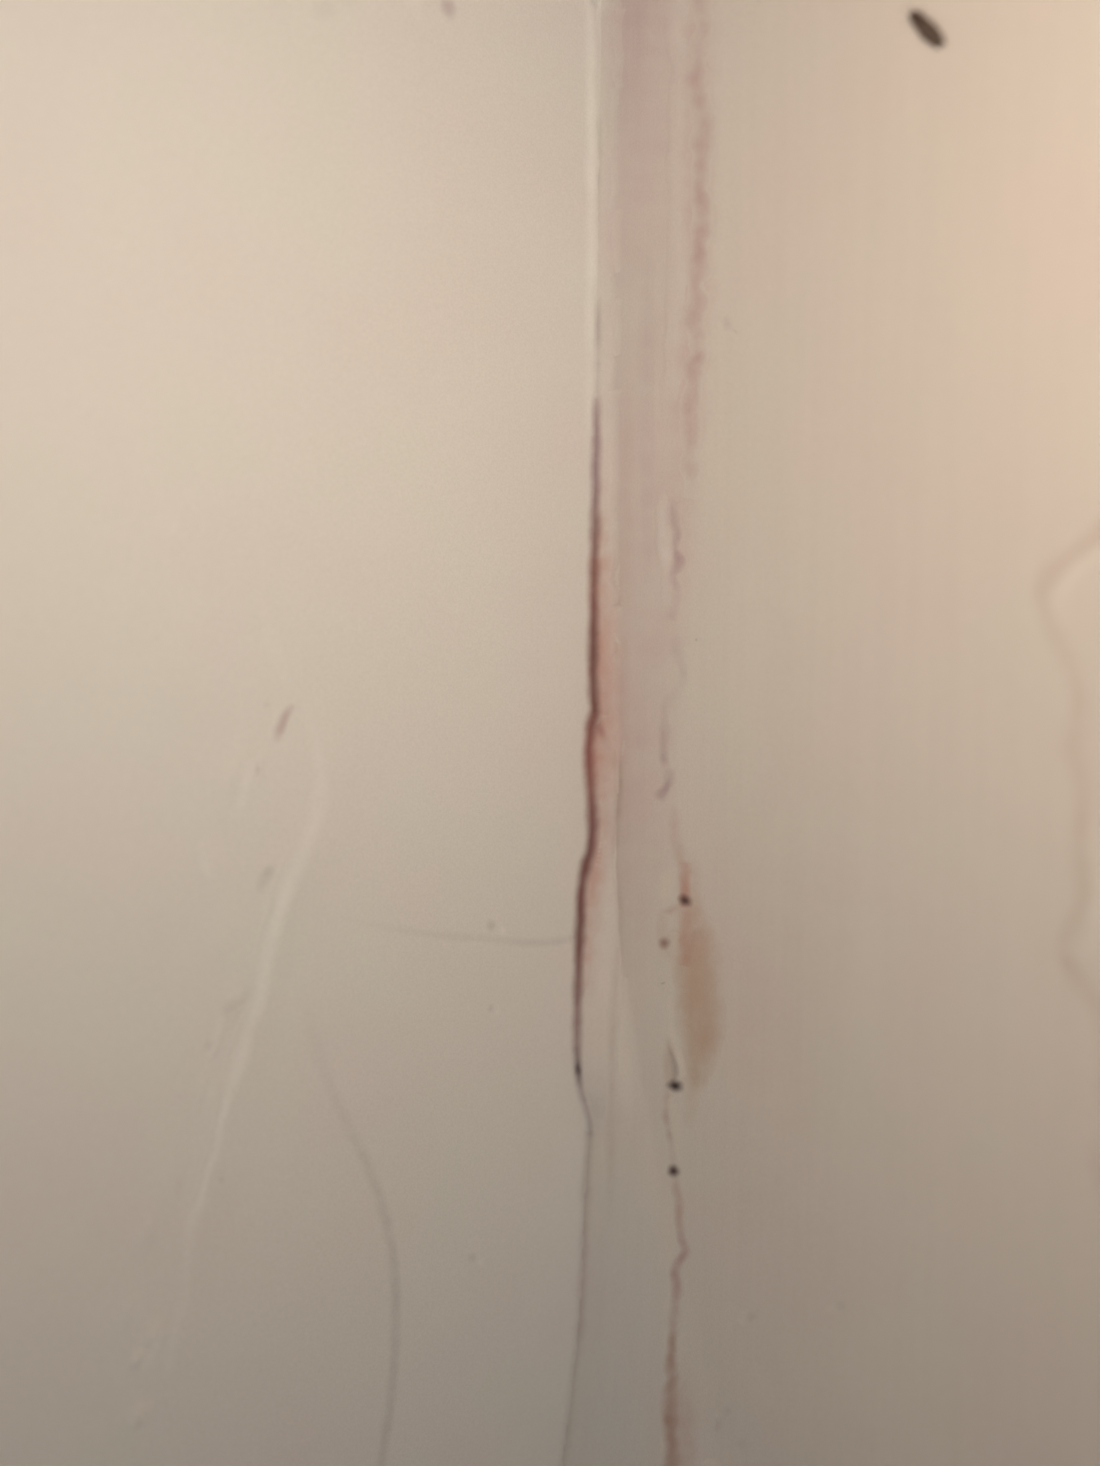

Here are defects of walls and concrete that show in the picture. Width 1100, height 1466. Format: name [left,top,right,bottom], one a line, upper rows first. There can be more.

crack [555,293,613,1466]
corrosion [659,1178,702,1466]
corrosion [654,851,727,1130]
water stain [598,0,871,1427]